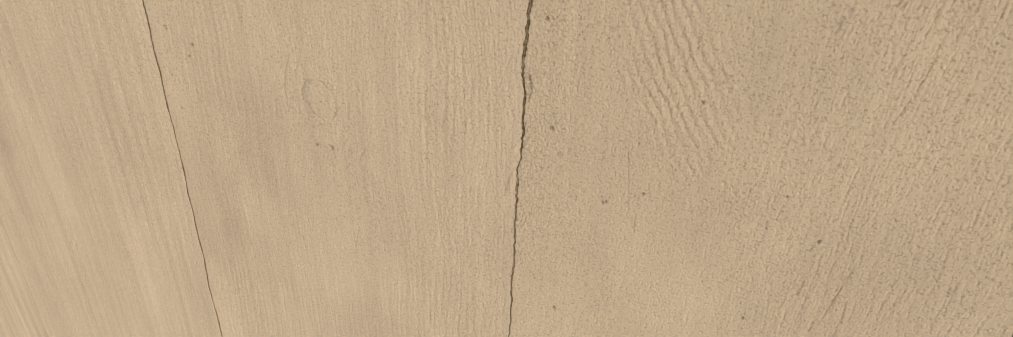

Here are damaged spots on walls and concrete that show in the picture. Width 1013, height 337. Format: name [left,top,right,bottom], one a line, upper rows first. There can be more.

crack [508,0,532,337]